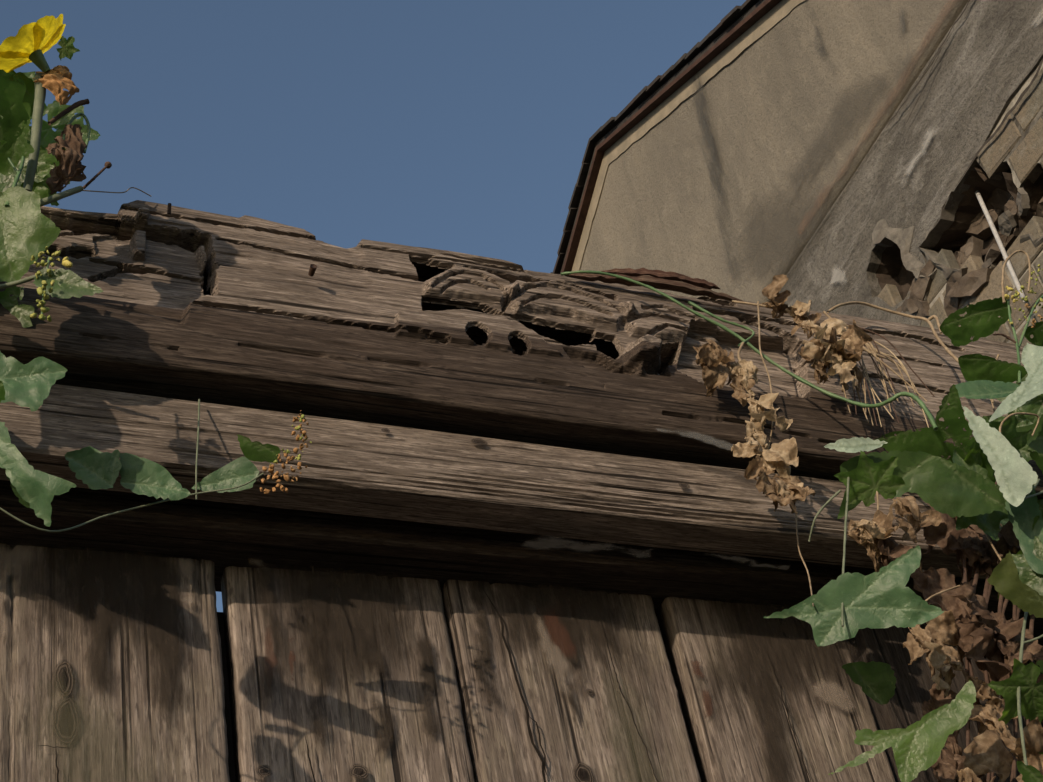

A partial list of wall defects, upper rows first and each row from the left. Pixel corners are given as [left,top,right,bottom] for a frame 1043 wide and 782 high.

peeling [906,131,933,174]
peeling [831,269,845,283]
spalling [872,167,1043,320]
crack [482,584,548,782]